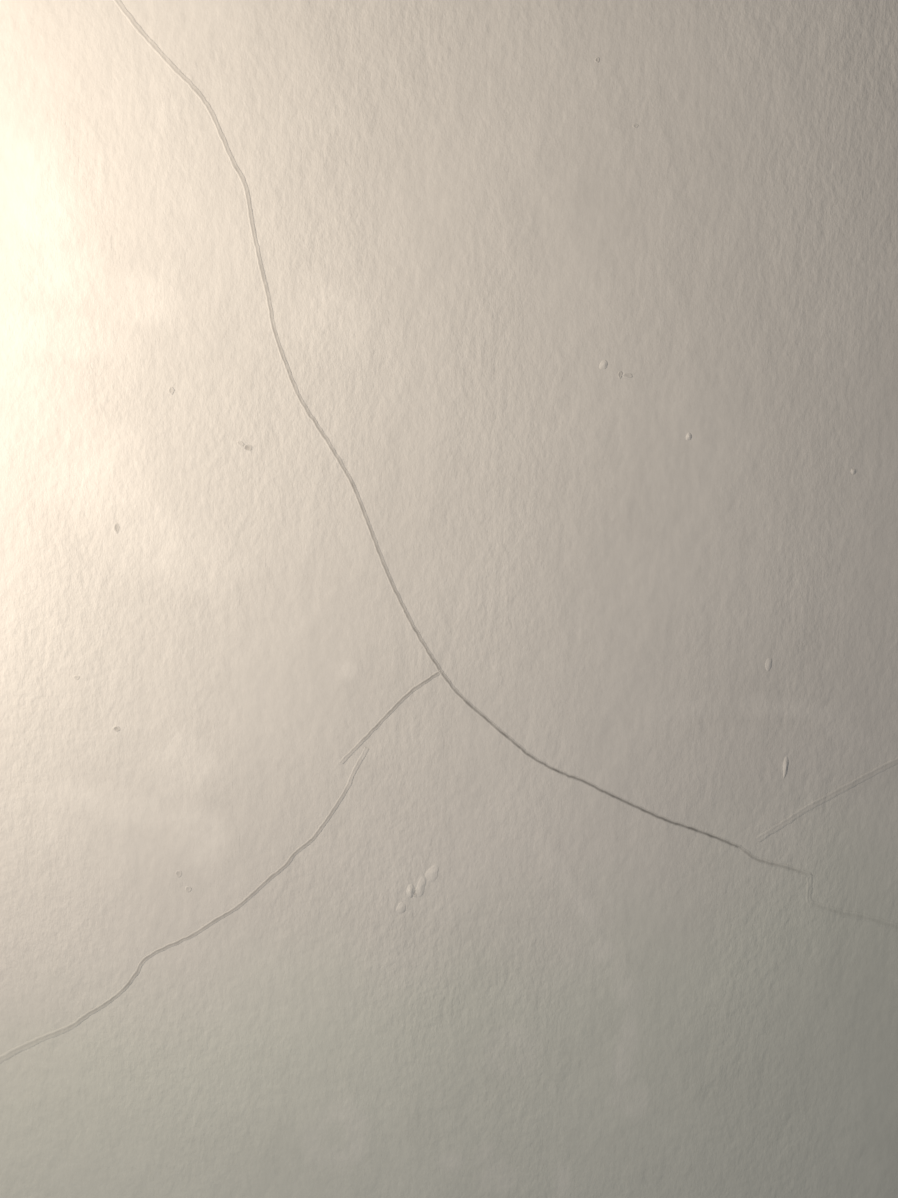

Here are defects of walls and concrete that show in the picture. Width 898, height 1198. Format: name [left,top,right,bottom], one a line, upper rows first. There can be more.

crack [0,747,369,1064]
crack [113,0,898,932]